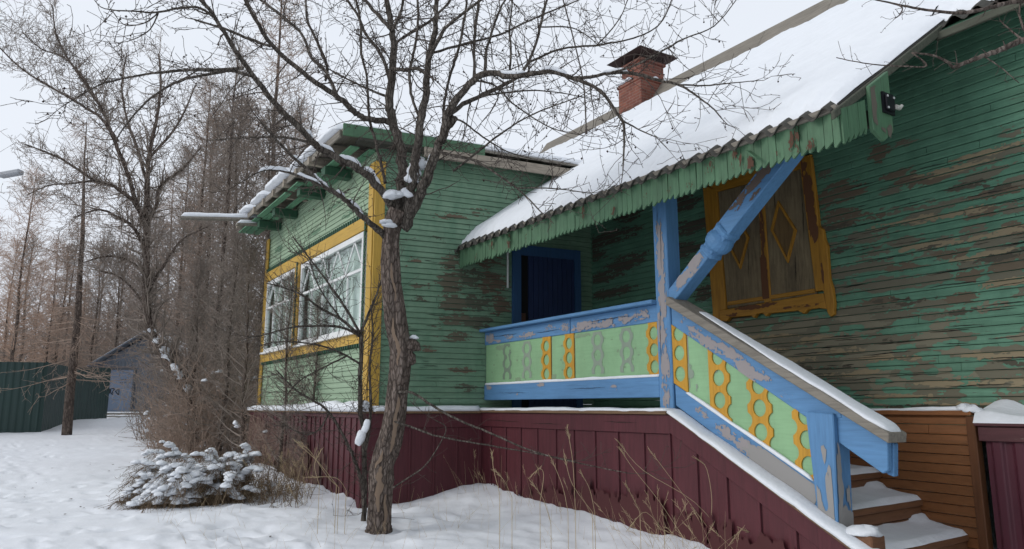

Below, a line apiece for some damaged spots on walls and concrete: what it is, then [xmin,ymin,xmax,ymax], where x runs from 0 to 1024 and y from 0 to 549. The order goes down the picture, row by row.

peeling [410,233,526,354]
peeling [592,182,712,408]
peeling [723,86,1024,408]